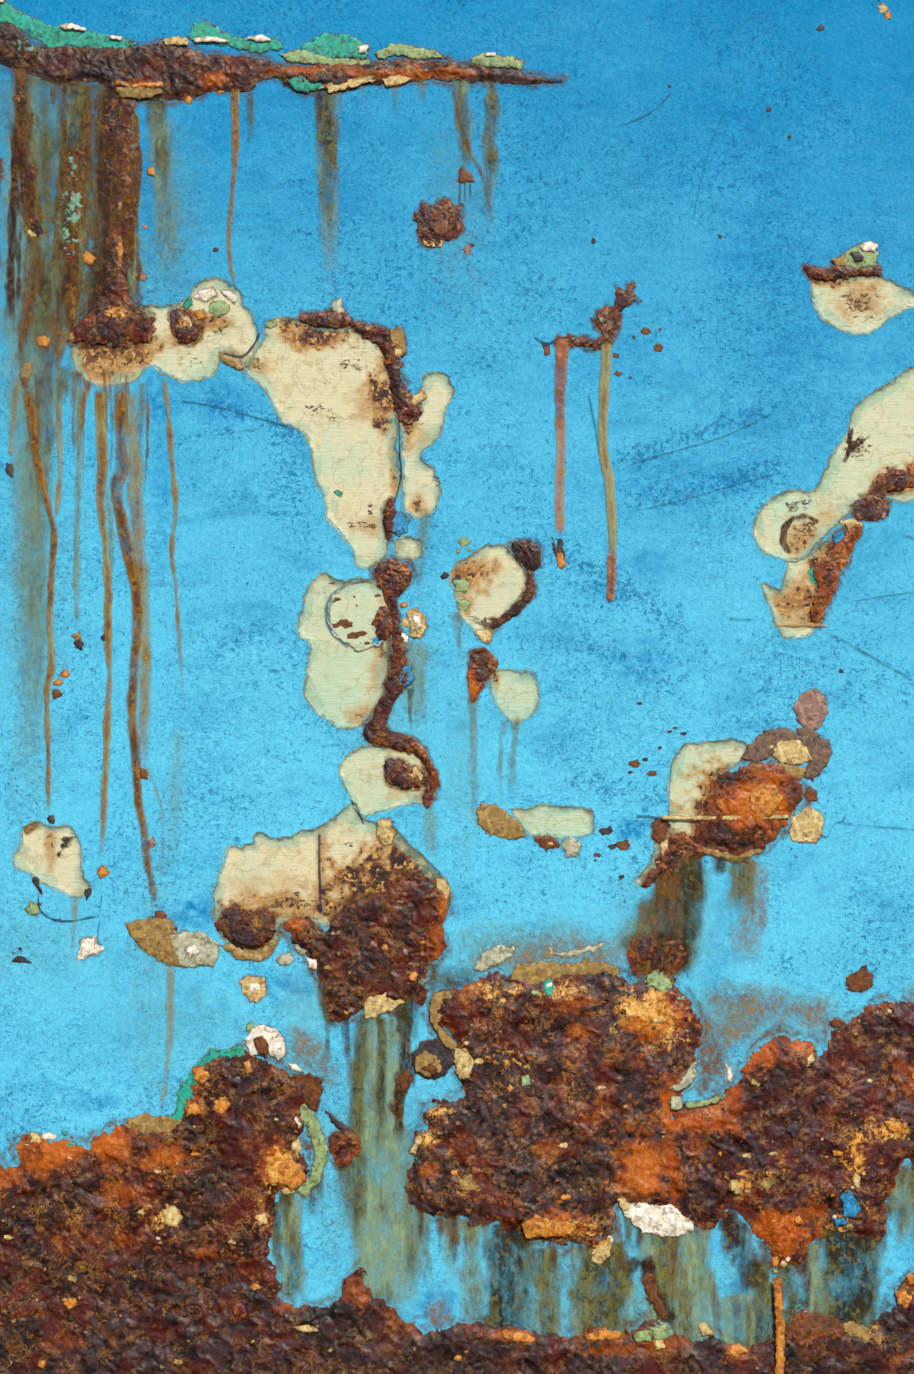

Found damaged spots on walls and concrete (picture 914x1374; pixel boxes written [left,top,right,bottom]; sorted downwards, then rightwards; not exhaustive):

peeling [803,241,914,335]
peeling [70,277,455,730]
corrosion [0,22,563,1043]
peeling [440,537,541,740]
corrosion [535,281,664,601]
peeling [752,367,914,639]
peeling [211,729,451,1022]
peeling [476,803,630,861]
water stain [271,1183,321,1294]
corrosion [0,934,914,1374]
water stain [319,977,881,1349]
water stain [888,1165,914,1235]